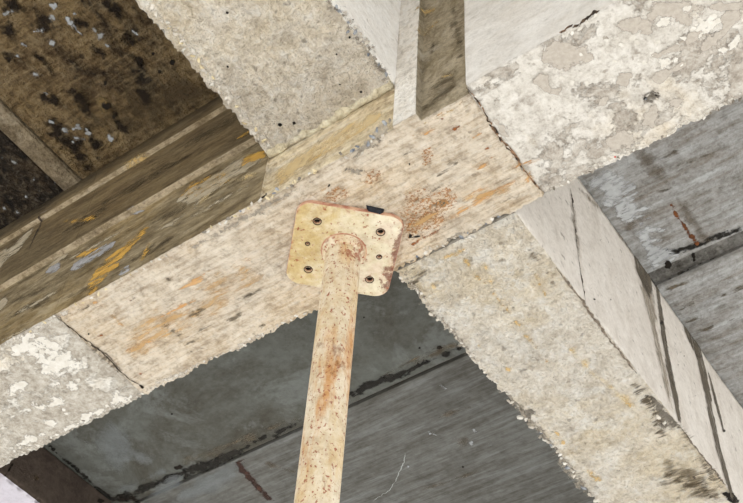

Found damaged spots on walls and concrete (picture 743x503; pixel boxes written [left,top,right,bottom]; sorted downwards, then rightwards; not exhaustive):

leakage [0,0,57,39]
leakage [65,13,109,59]
peeling [616,0,743,128]
leakage [45,119,114,171]
crack [466,87,542,190]
rust [398,181,515,246]
rust [670,204,703,246]
crack [556,194,636,372]
peeling [5,255,167,391]
crack [54,315,144,389]
peeling [2,312,307,462]
rust [236,460,274,501]